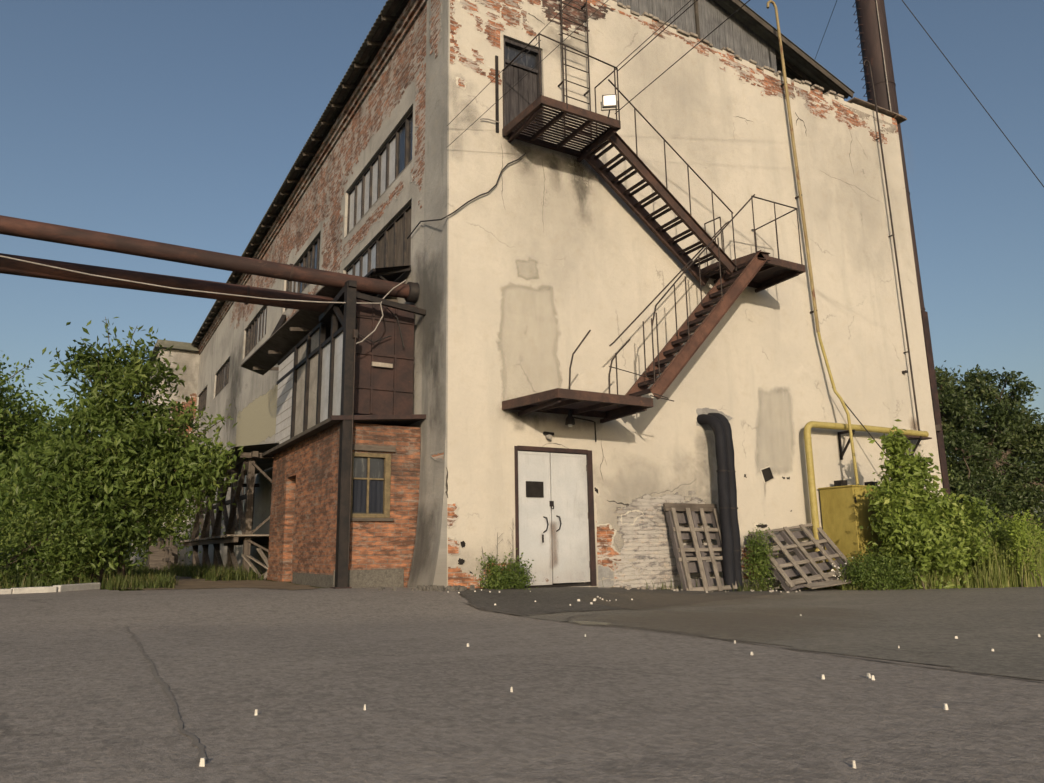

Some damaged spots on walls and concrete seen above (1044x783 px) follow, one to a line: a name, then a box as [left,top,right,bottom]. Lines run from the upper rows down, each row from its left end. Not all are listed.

spalling [261,0,897,273]
spalling [230,302,257,331]
spalling [245,275,282,289]
leakage [416,269,439,356]
spalling [167,393,197,437]
peeling [593,486,711,589]
crack [124,625,207,761]